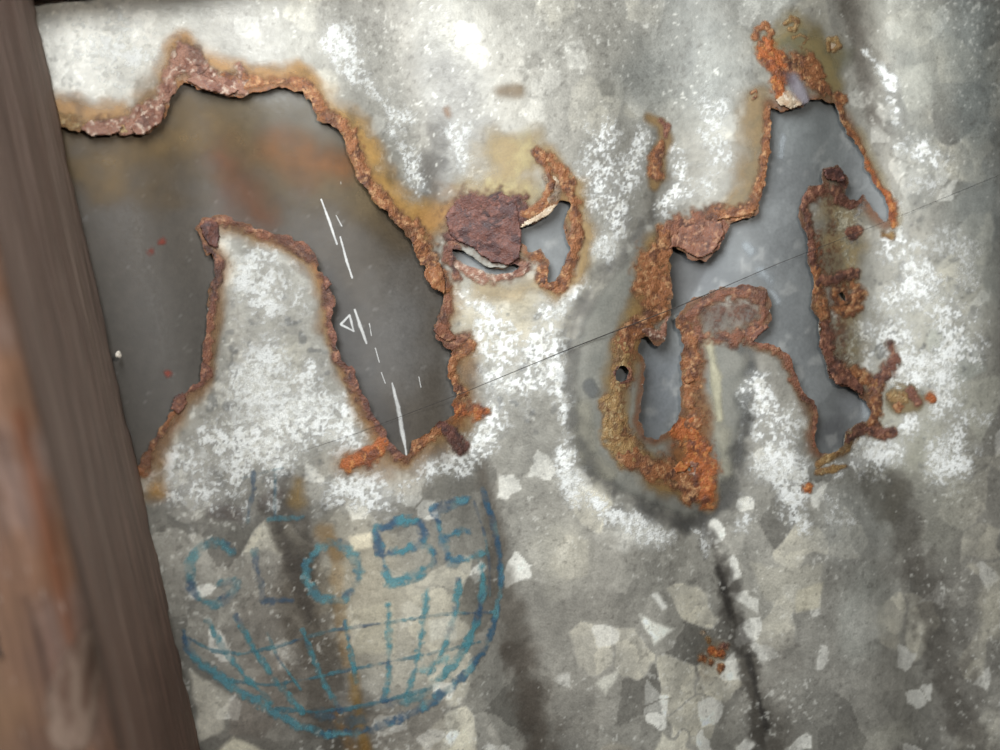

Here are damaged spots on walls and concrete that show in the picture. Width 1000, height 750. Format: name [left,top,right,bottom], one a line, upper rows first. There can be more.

rust [698,631,729,674]